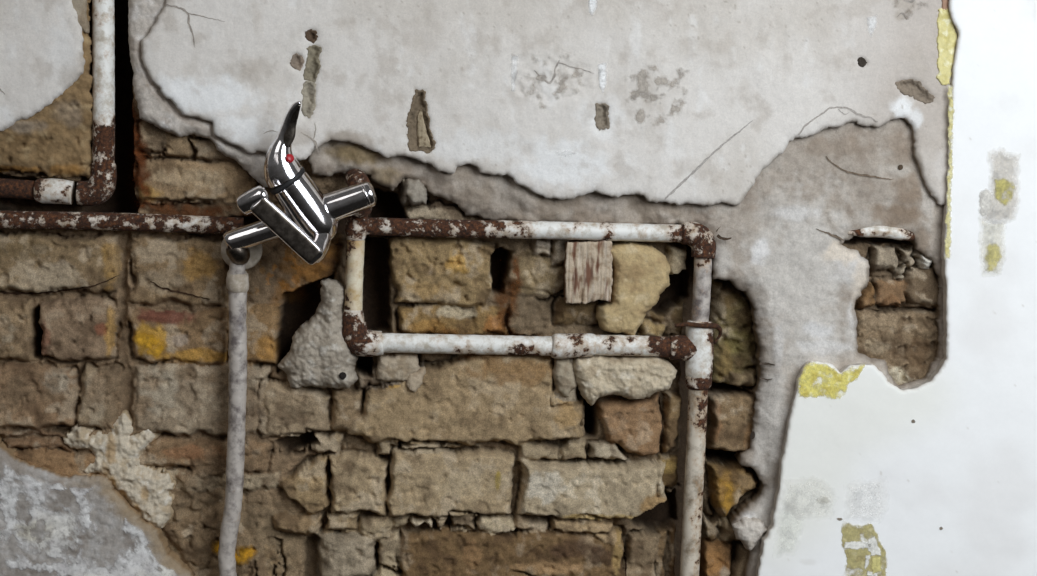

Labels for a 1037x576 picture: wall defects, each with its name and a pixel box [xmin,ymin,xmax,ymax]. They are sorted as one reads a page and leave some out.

spalling [0,0,283,226]
crack [166,4,225,47]
crack [665,121,752,199]
crack [799,106,878,134]
spalling [235,0,957,576]
spalling [0,228,229,576]